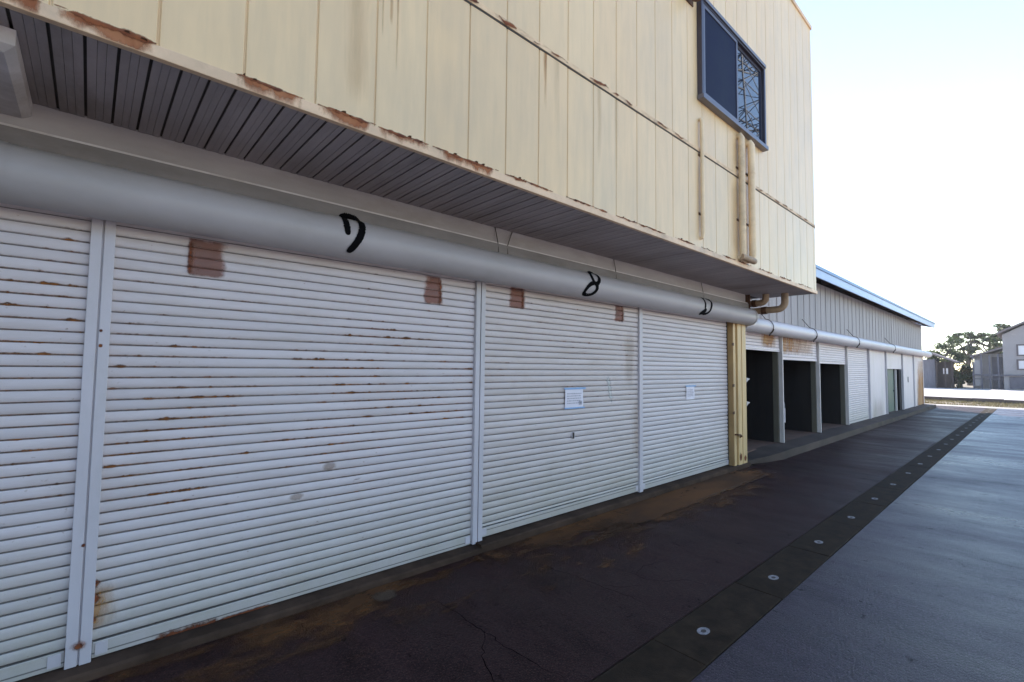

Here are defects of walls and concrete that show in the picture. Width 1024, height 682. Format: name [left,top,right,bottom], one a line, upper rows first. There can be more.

corrosion [54,4,157,50]
corrosion [236,73,303,101]
corrosion [318,104,553,192]
corrosion [566,196,665,234]
corrosion [187,238,225,277]
corrosion [0,260,83,367]
corrosion [424,276,442,311]
corrosion [509,287,525,309]
corrosion [0,377,77,478]
corrosion [104,323,256,515]
corrosion [265,320,473,500]
corrosion [93,580,104,624]